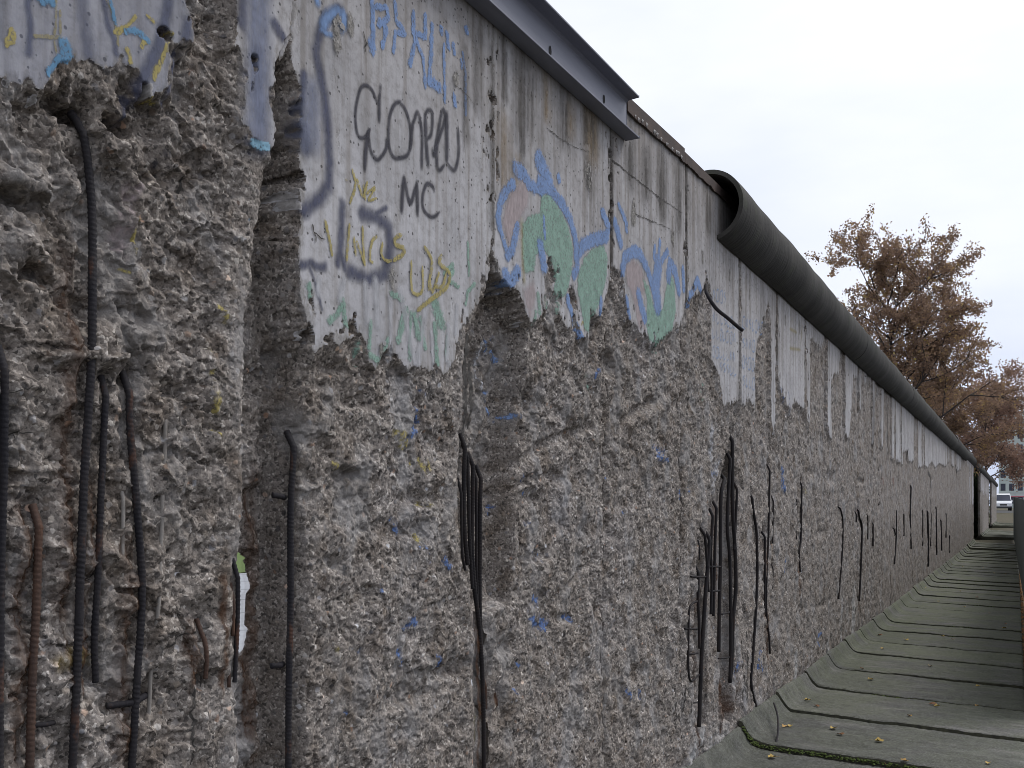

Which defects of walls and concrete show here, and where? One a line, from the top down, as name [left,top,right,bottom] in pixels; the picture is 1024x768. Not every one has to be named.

spalling [0,0,611,768]
spalling [605,131,618,248]
spalling [599,198,974,768]